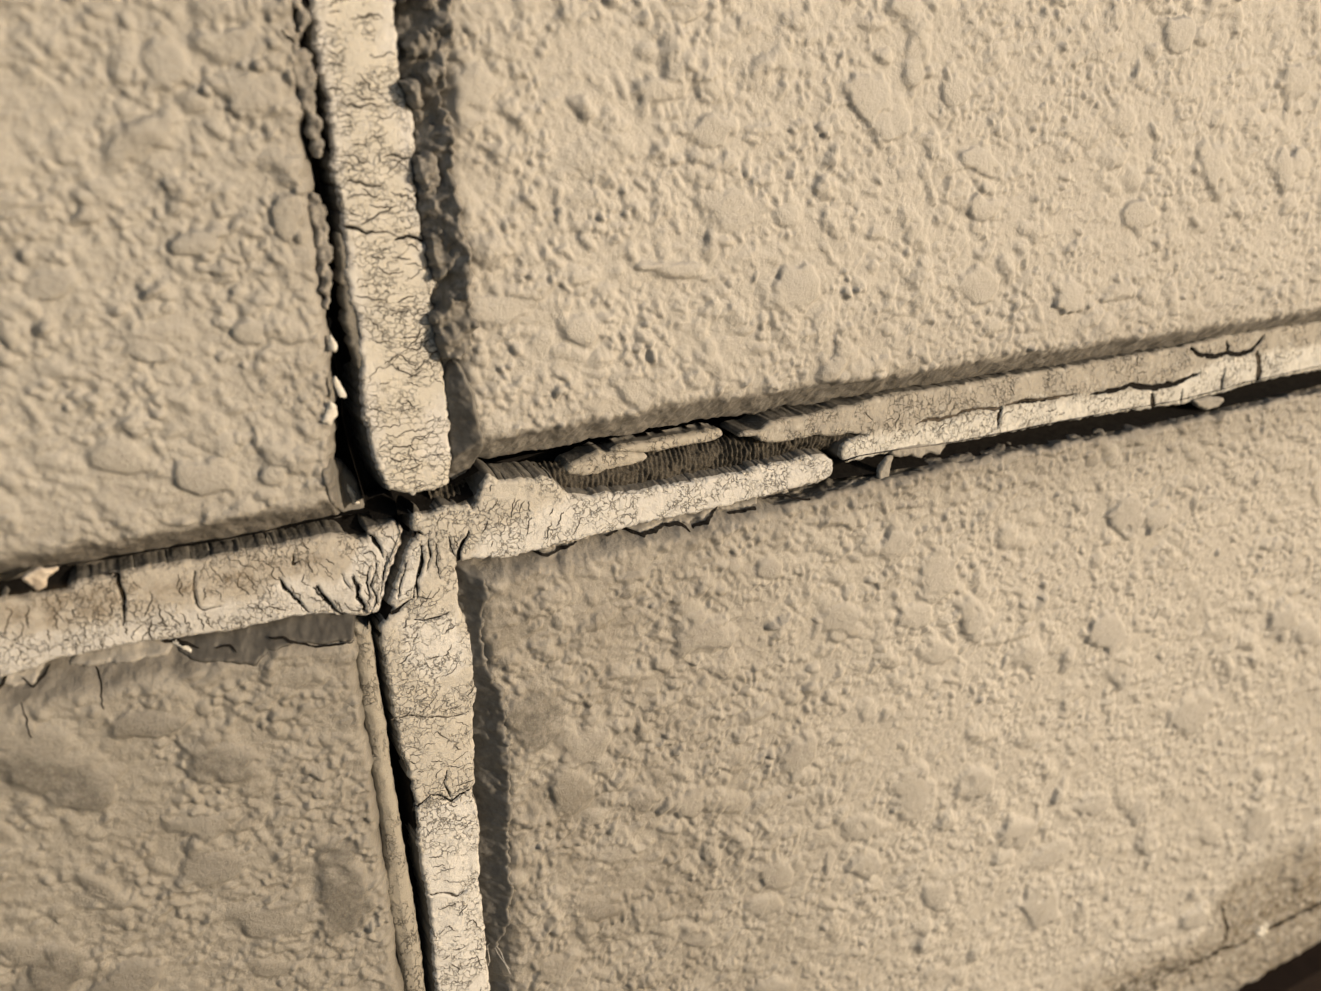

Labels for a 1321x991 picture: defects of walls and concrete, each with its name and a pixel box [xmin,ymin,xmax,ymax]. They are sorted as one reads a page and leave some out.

crack [861,329,1308,443]
crack [0,0,811,991]
peeling [537,490,788,552]